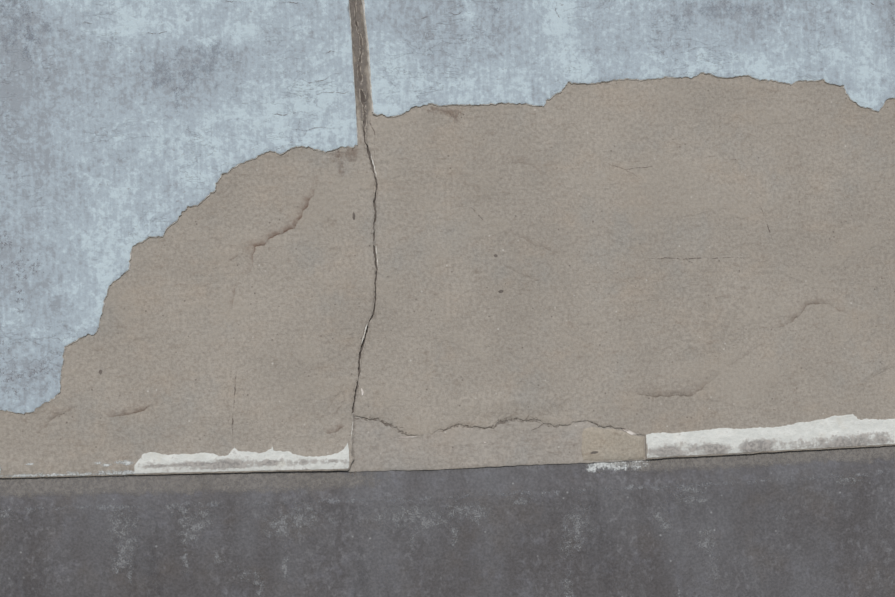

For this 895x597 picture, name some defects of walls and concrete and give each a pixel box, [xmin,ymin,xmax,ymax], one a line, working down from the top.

peeling [0,2,652,478]
crack [443,417,560,431]
peeling [354,0,895,459]